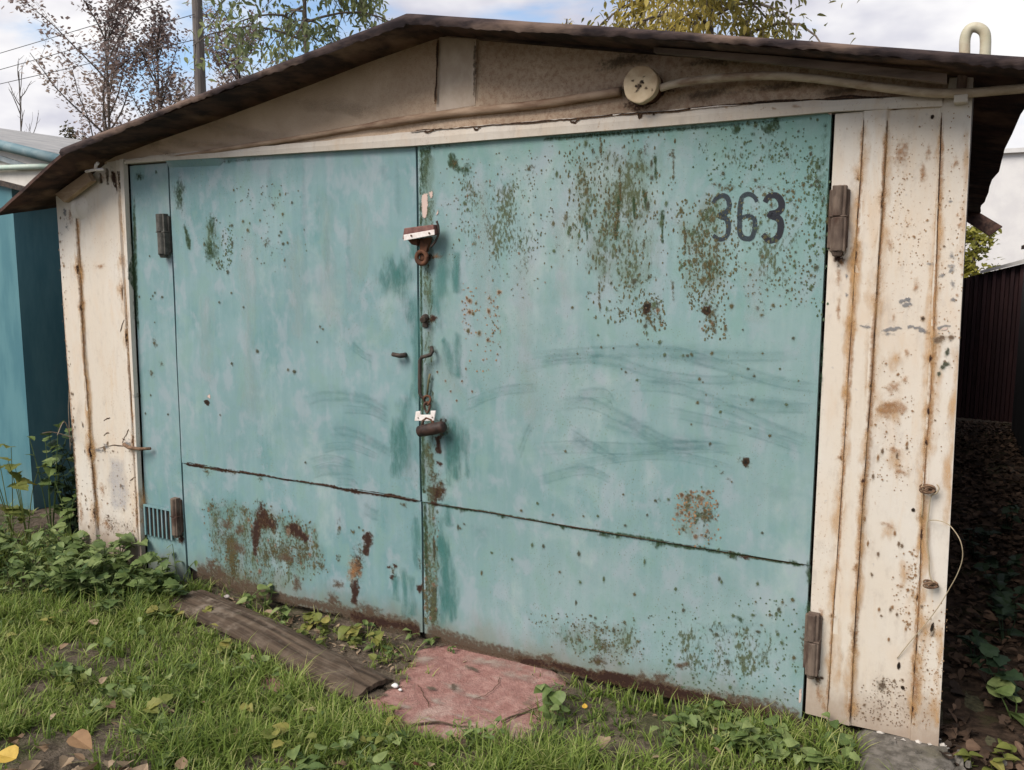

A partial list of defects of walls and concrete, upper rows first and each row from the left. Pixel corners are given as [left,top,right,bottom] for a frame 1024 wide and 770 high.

corrosion [58,216,151,535]
corrosion [99,168,121,191]
corrosion [429,117,819,372]
corrosion [849,106,970,729]
corrosion [185,418,804,722]